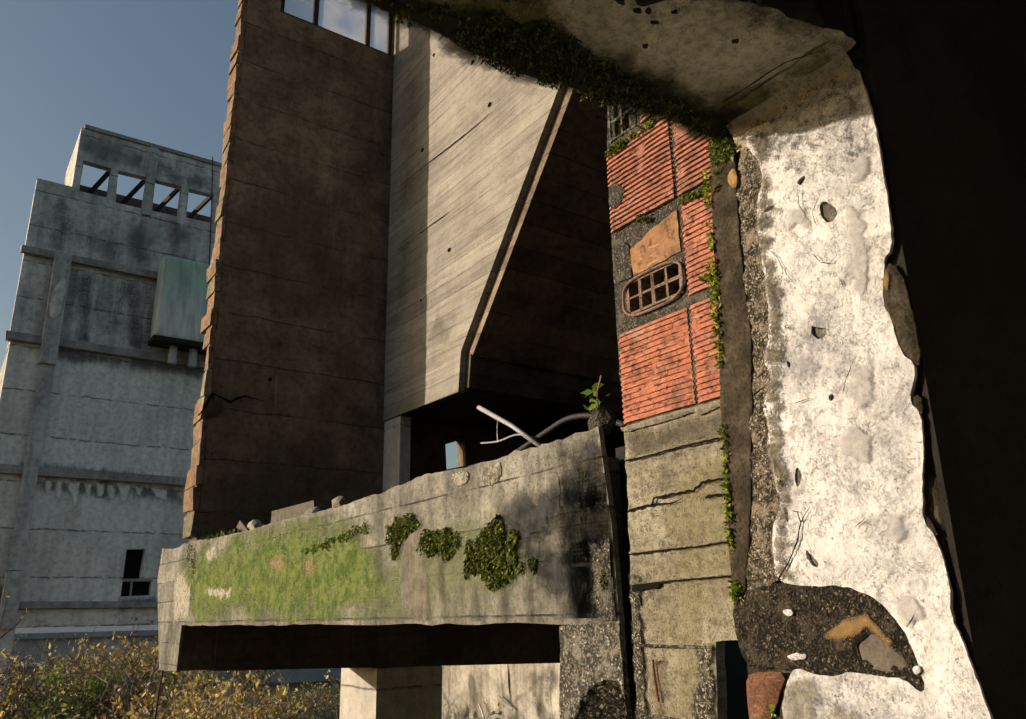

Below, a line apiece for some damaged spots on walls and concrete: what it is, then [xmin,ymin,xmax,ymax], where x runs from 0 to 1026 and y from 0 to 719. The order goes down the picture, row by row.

crack [198,393,265,416]
leakage [38,466,176,507]
leakage [502,440,614,618]
crack [627,478,726,513]
crack [777,507,810,582]
spalling [575,574,661,719]
spalling [691,644,715,719]
flaking render [733,583,924,719]